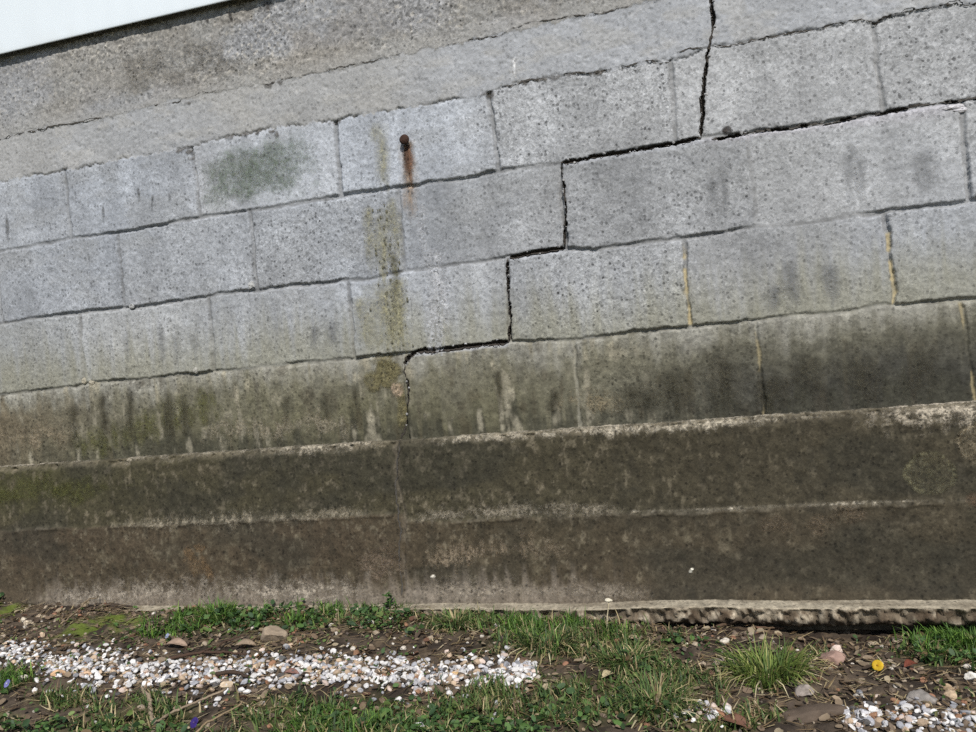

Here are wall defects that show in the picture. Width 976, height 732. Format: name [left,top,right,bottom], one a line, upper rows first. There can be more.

crack [266,55,398,85]
corrosion [403,141,413,203]
crack [395,0,976,595]
leakage [275,441,371,453]
leakage [445,394,784,441]
leakage [883,400,976,457]
leakage [58,581,351,606]